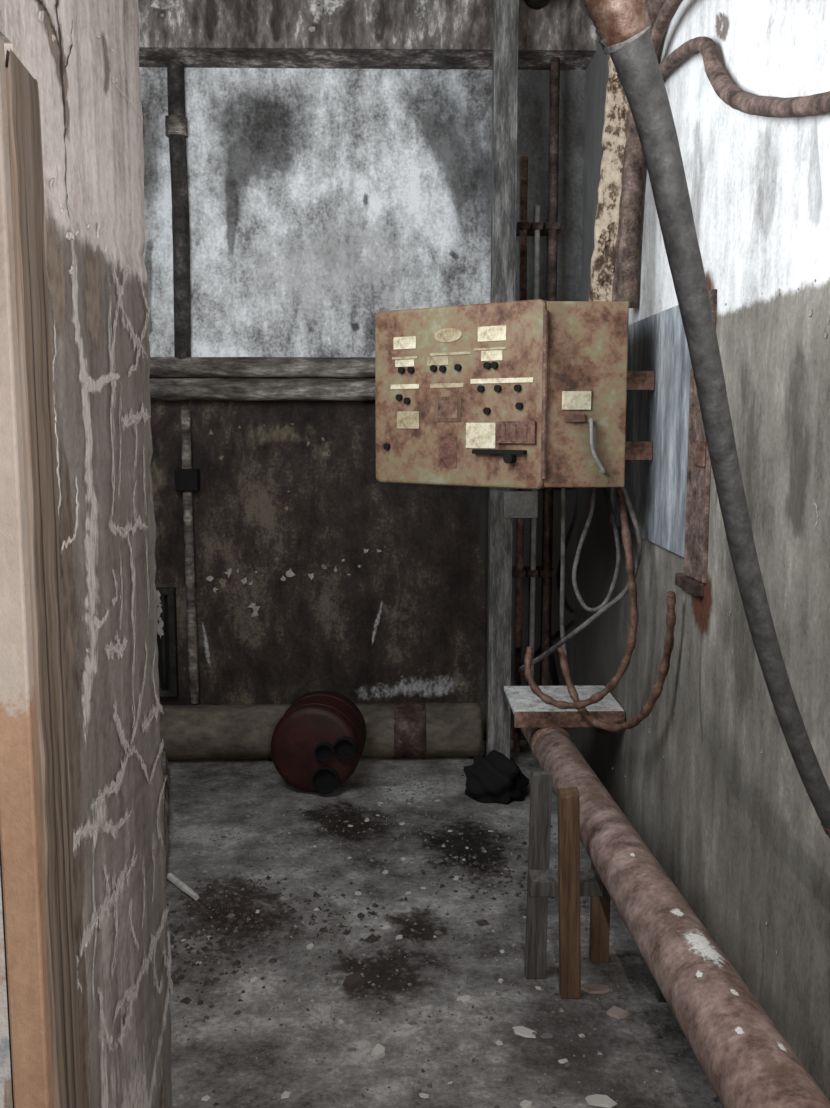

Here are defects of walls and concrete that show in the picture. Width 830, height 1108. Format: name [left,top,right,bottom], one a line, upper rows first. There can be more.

crack [38,0,73,221]
damp [222,97,294,188]
crack [73,251,174,1053]